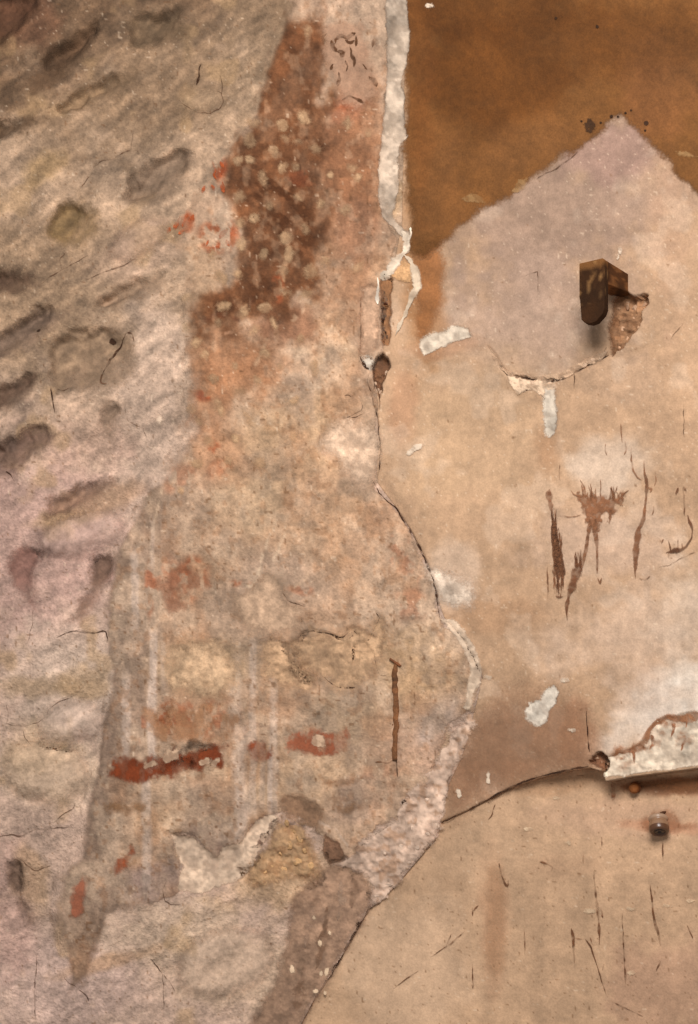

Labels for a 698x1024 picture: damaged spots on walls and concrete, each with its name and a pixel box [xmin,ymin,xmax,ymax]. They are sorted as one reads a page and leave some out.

flaking render [324,0,422,397]
damp [402,0,698,337]
flaking render [420,325,471,355]
flaking render [492,295,649,437]
crack [344,298,483,679]
rust [546,480,629,617]
rust [624,452,657,579]
rust [661,508,693,553]
peeling [165,567,489,1024]
crack [443,711,590,822]
flaking render [590,712,698,777]
rust [609,712,698,761]